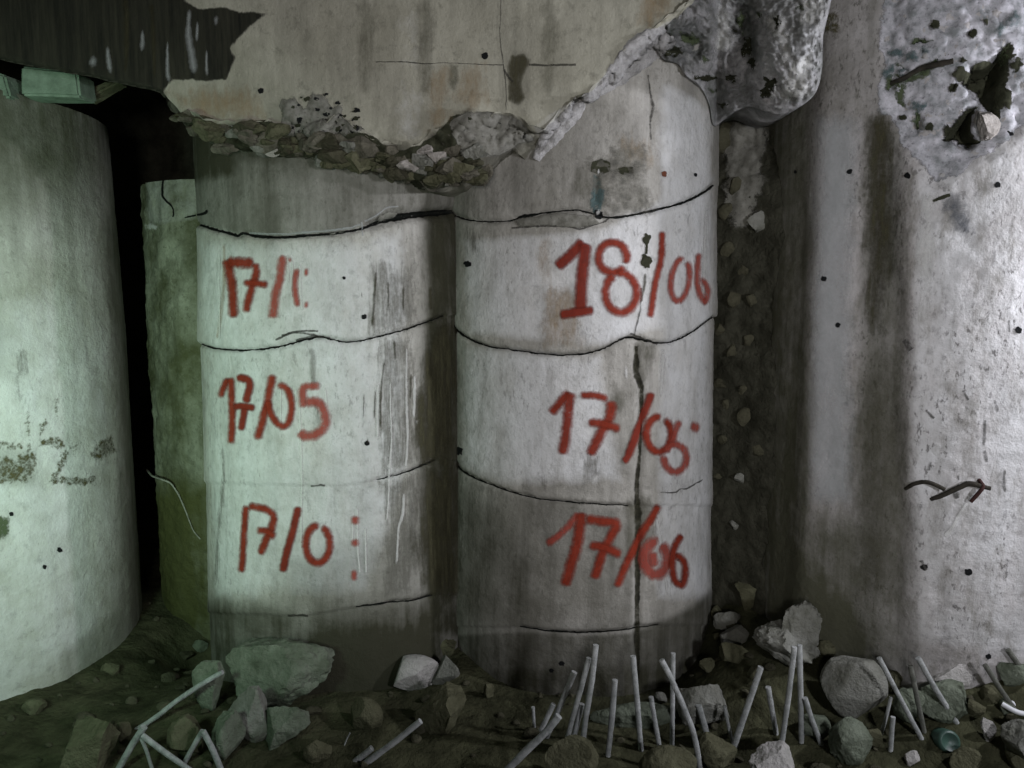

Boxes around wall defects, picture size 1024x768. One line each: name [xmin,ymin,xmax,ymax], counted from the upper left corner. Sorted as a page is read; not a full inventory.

crack [647,75,655,138]
spalling [877,0,1024,182]
spalling [169,93,493,190]
crack [161,180,714,239]
spalling [590,150,649,219]
leakage [864,115,893,329]
leakage [0,419,96,486]
leakage [91,437,115,459]
crack [201,288,712,684]